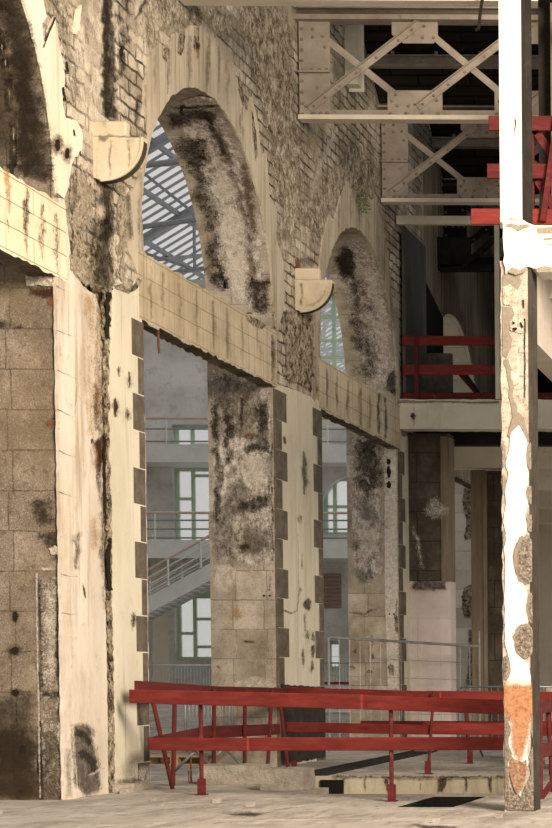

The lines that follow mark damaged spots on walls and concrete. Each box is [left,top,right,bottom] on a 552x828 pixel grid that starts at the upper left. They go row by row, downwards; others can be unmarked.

crack [100,282,115,793]
leakage [210,377,272,523]
leakage [353,436,384,500]
spalling [504,514,533,679]
leakage [0,577,61,798]
rust [504,685,532,795]
spalling [505,714,534,810]